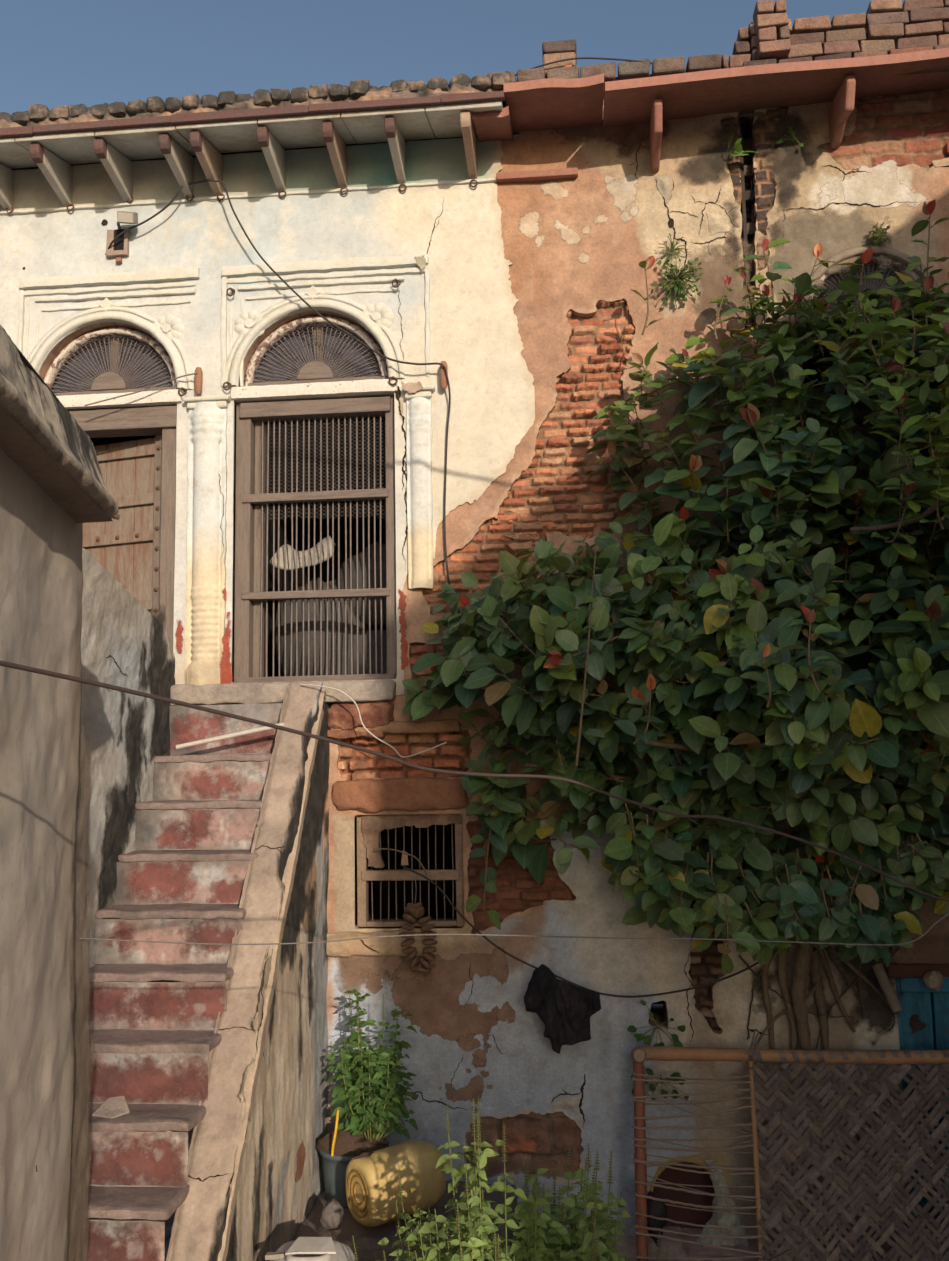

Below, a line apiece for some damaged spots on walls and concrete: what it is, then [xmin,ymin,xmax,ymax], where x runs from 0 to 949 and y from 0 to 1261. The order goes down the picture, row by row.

leakage [679,127,737,184]
spalling [817,90,949,209]
peeling [519,174,639,264]
crack [628,131,739,304]
spalling [423,299,645,626]
spalling [398,590,448,693]
leakage [66,605,175,1261]
spalling [466,820,576,936]
spalling [688,925,724,1031]
peeling [366,948,583,1179]
crack [551,1073,586,1126]